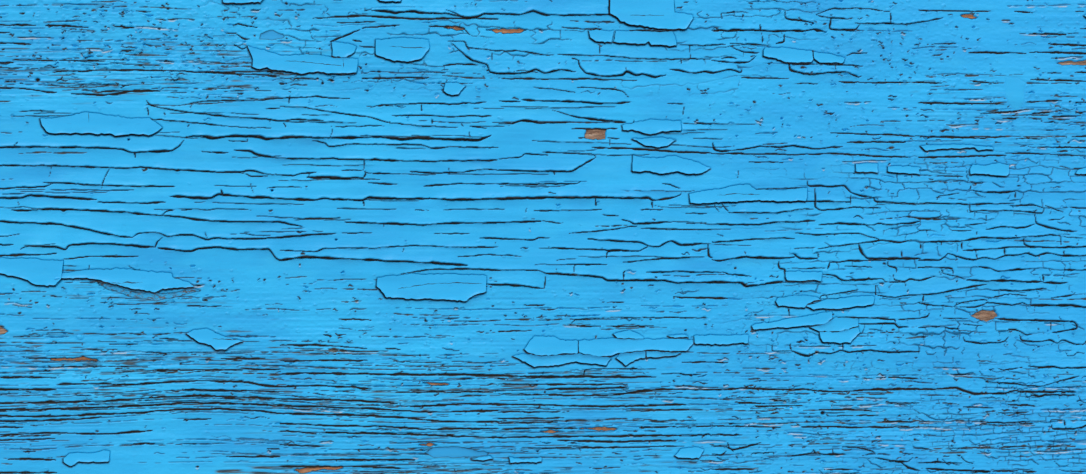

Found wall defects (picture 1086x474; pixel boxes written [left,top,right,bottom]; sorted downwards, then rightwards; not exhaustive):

peeling [585,129,606,140]
crack [0,0,1086,345]
peeling [971,310,997,322]